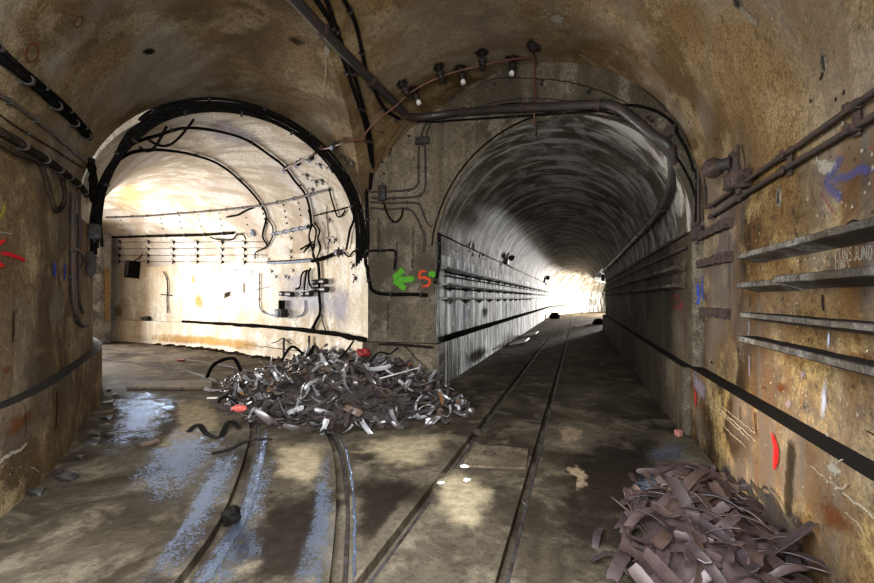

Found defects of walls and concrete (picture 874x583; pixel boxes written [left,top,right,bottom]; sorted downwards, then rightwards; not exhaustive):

water stain [255,491,323,583]